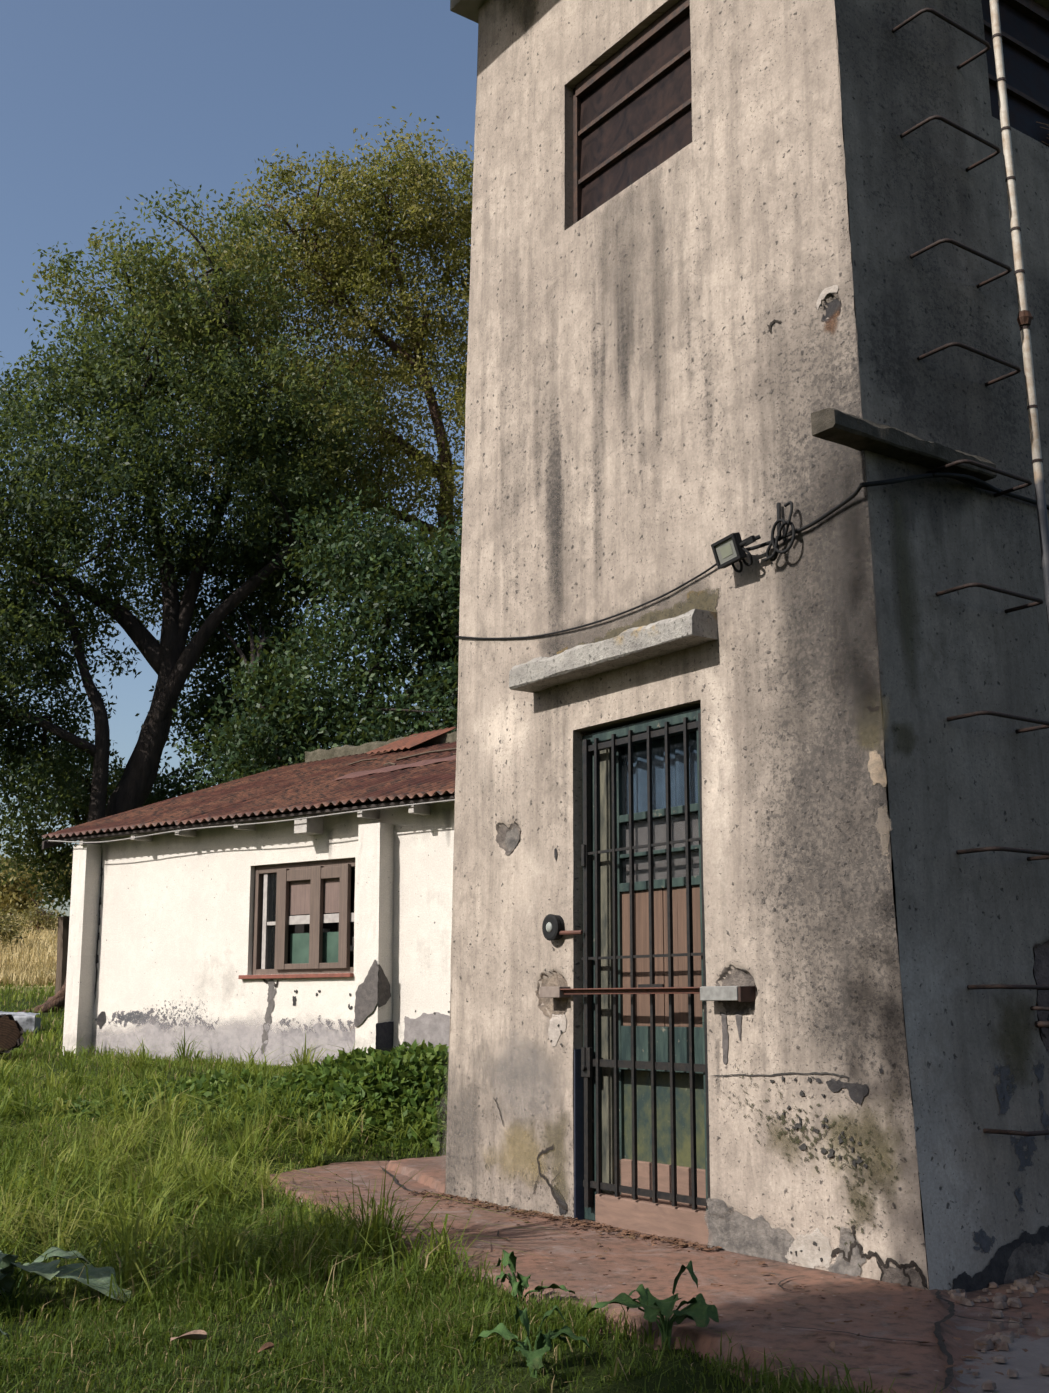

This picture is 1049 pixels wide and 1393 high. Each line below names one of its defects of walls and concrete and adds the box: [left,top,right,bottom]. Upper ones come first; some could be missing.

spalling [496,821,521,855]
peeling [95,1008,219,1032]
spalling [277,960,450,1052]
peeling [993,940,1049,1213]
peeling [704,964,906,1277]
crack [533,1144,567,1215]
spalling [952,1226,1049,1292]